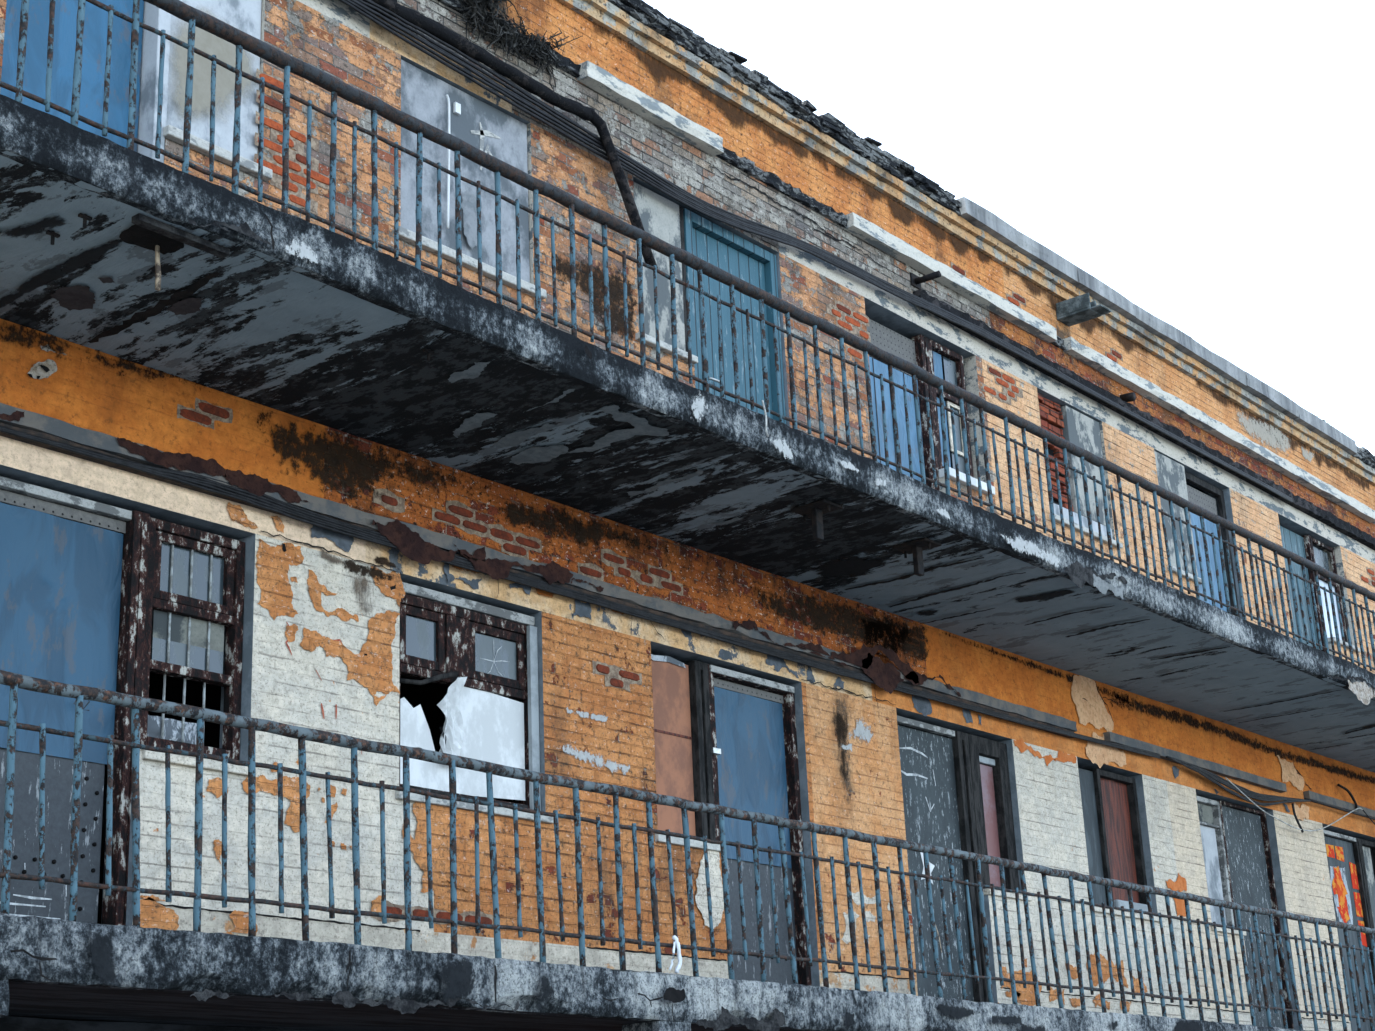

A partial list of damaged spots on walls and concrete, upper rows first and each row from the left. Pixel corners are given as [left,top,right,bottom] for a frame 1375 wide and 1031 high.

spalling [119,213,271,291]
mould [257,411,668,552]
peeling [495,405,669,465]
peeling [225,469,405,706]
flaking render [432,500,683,620]
damp [834,699,874,801]
peeling [1014,675,1126,768]
spalling [1348,680,1375,705]
peeling [371,802,504,927]
damp [79,929,119,987]
damp [438,957,476,1004]
damp [536,973,554,1010]